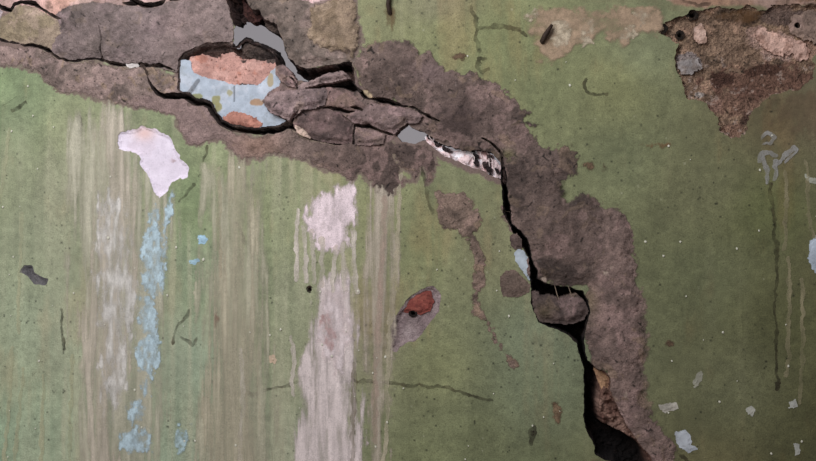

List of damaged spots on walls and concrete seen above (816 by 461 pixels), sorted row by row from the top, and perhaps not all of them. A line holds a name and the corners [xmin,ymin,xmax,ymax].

crack [0,0,61,19]
crack [122,0,178,8]
crack [0,38,440,145]
spalling [0,0,507,196]
spalling [524,0,816,139]
water stain [66,104,173,461]
peeling [117,125,189,454]
water stain [289,184,402,461]
spalling [390,286,441,352]
spalling [500,249,531,297]
crack [482,138,652,461]
peeling [807,237,816,273]